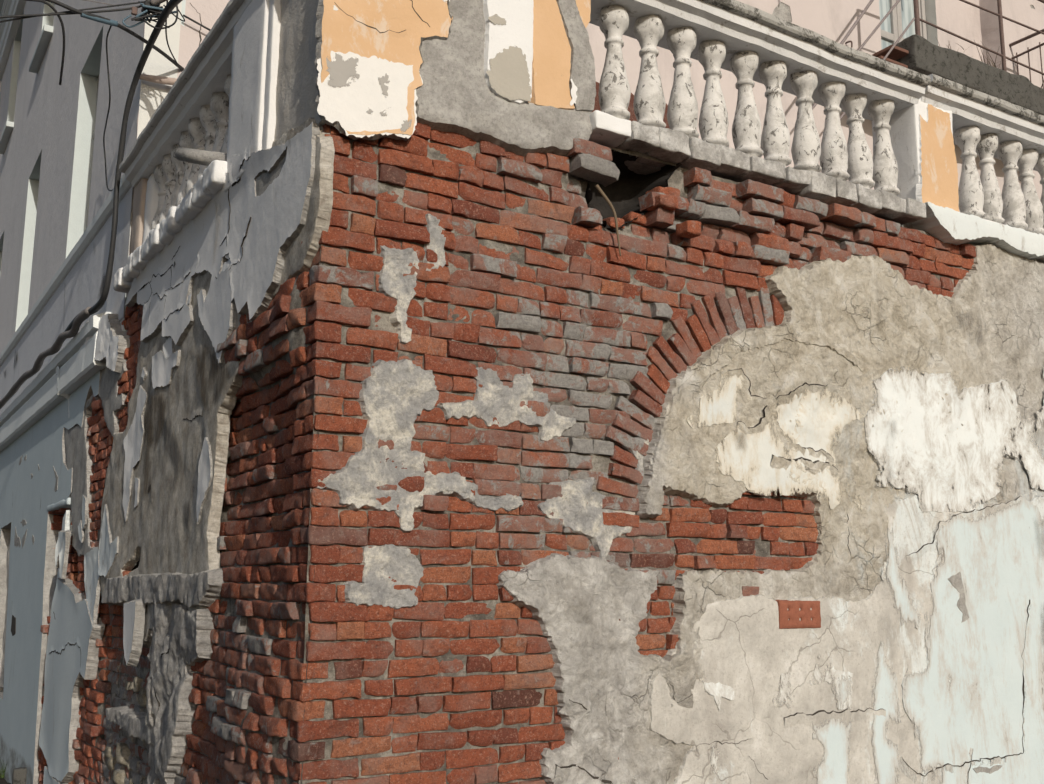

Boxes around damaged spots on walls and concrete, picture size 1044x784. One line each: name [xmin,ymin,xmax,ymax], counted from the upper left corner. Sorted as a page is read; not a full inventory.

crack [333,0,430,38]
spalling [488,14,506,25]
spalling [206,46,1044,784]
peeling [196,437,213,524]
peeling [38,302,181,784]
crack [696,739,768,781]
crack [784,708,886,728]
crack [898,600,1031,783]